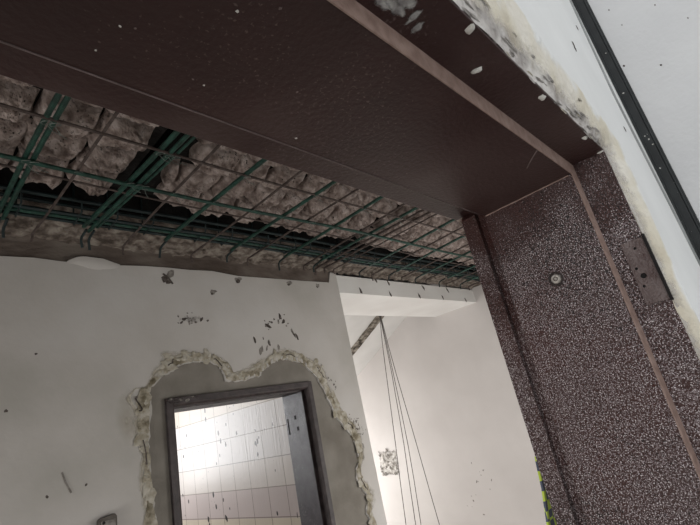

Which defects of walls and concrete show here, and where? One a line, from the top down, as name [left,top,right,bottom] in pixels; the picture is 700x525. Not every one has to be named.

peeling [0,75,481,290]
spalling [351,316,384,356]
spalling [126,337,377,525]